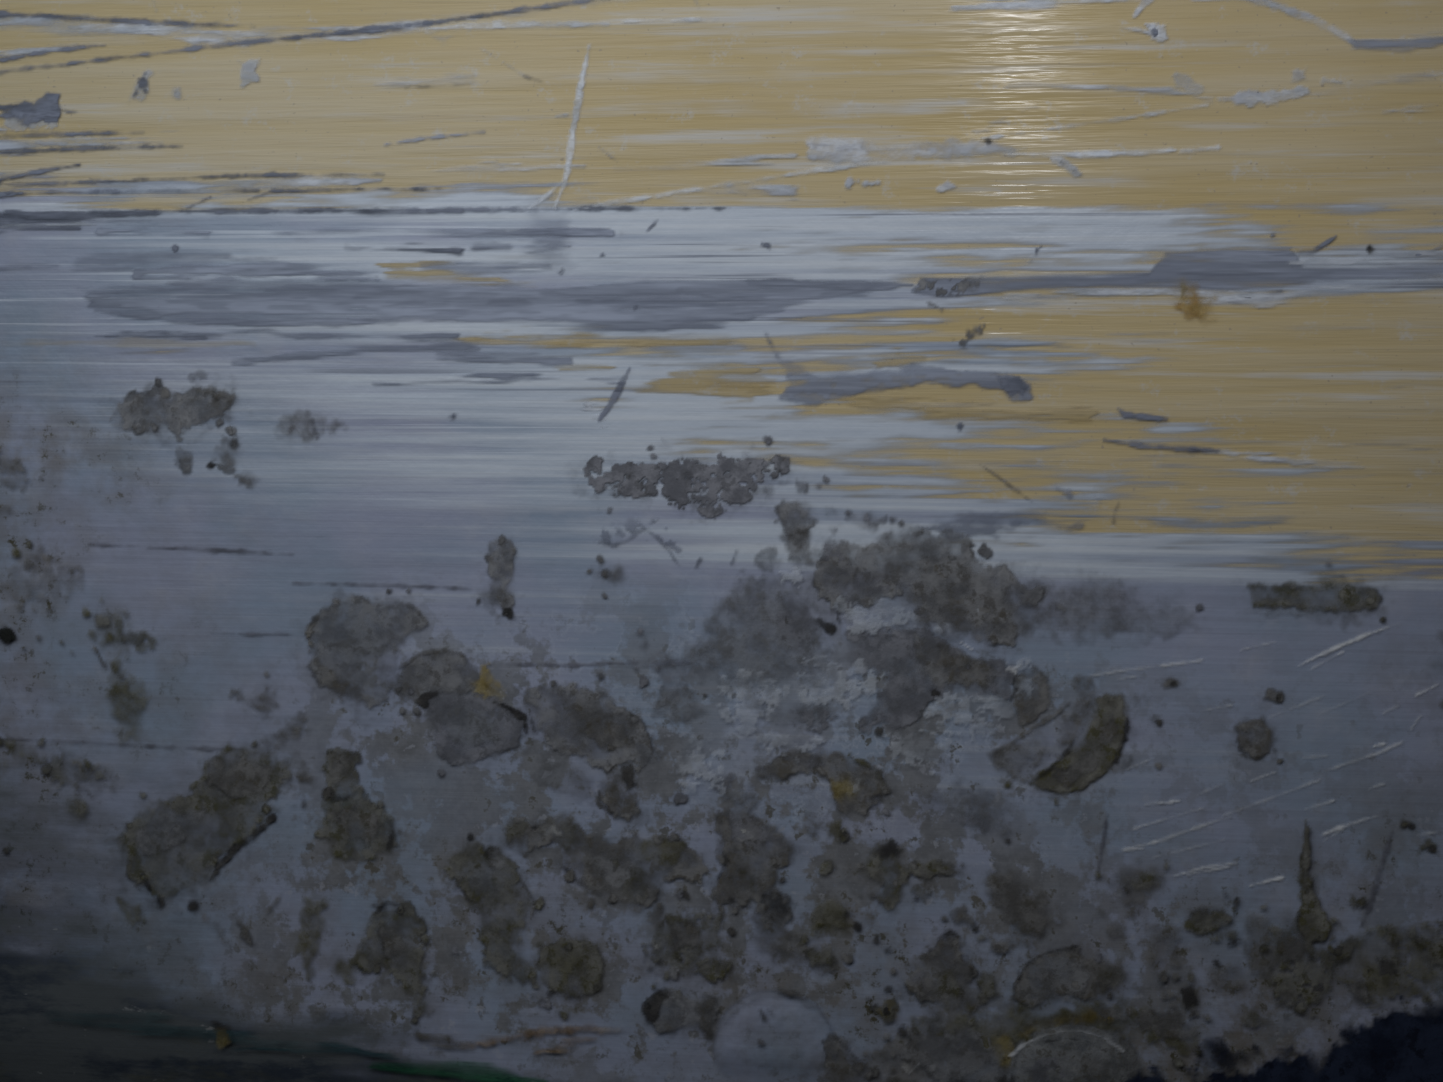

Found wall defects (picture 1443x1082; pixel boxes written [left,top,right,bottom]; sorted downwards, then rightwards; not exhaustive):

peeling [1146,23,1167,41]
peeling [134,71,150,95]
peeling [1230,86,1308,107]
spalling [3,93,60,125]
peeling [0,140,32,154]
peeling [1128,244,1443,299]
peeling [1128,423,1210,442]
peeling [1042,474,1127,492]
peeling [841,569,876,597]
peeling [1005,586,1019,605]
peeling [751,839,774,869]
spalling [1242,1010,1260,1027]